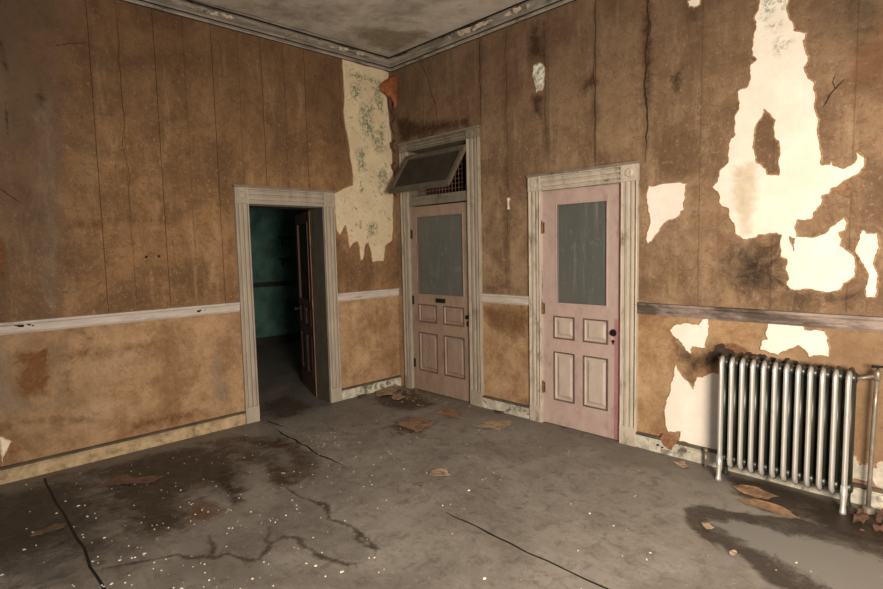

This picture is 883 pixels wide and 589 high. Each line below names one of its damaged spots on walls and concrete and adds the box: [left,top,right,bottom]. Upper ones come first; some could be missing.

peeling [146,0,550,67]
flaking render [706,343,823,369]
crack [43,478,106,589]
water stain [0,437,311,580]
water stain [169,536,351,565]
crack [446,512,609,589]
water stain [684,477,883,589]